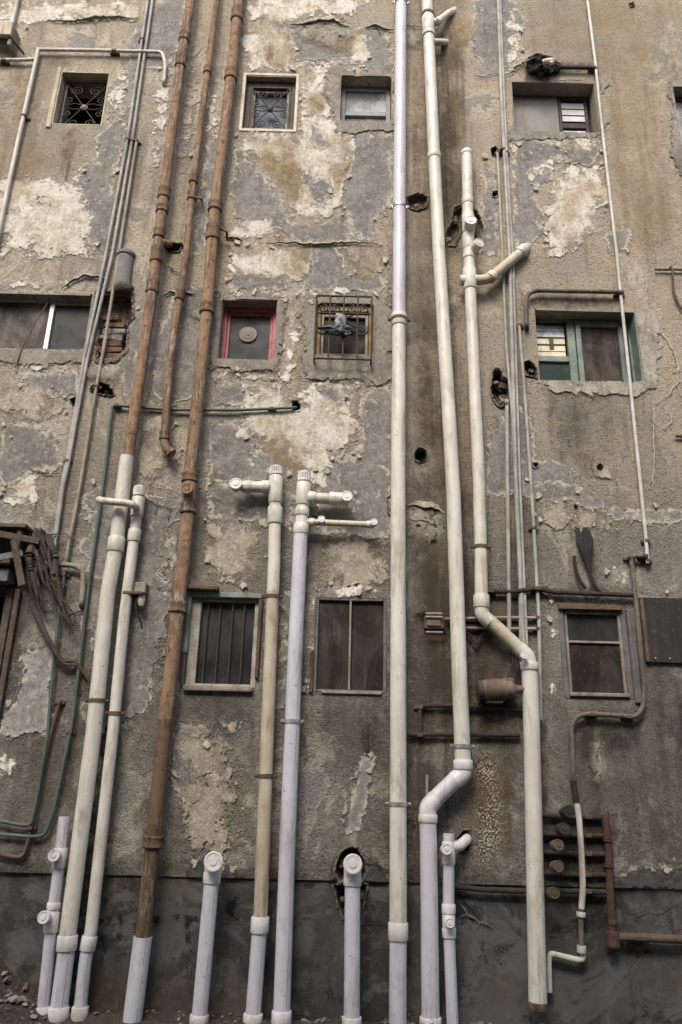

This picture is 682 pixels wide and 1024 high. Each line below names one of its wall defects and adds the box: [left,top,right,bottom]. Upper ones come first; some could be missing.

crack [47,14,139,23]
crack [61,272,109,289]
peeling [0,0,220,259]
crack [224,235,379,248]
peeling [225,0,395,304]
peeling [509,138,632,257]
peeling [0,282,392,741]
water stain [464,580,502,655]
peeling [170,721,244,873]
peeling [332,751,376,919]
water stain [473,700,515,866]